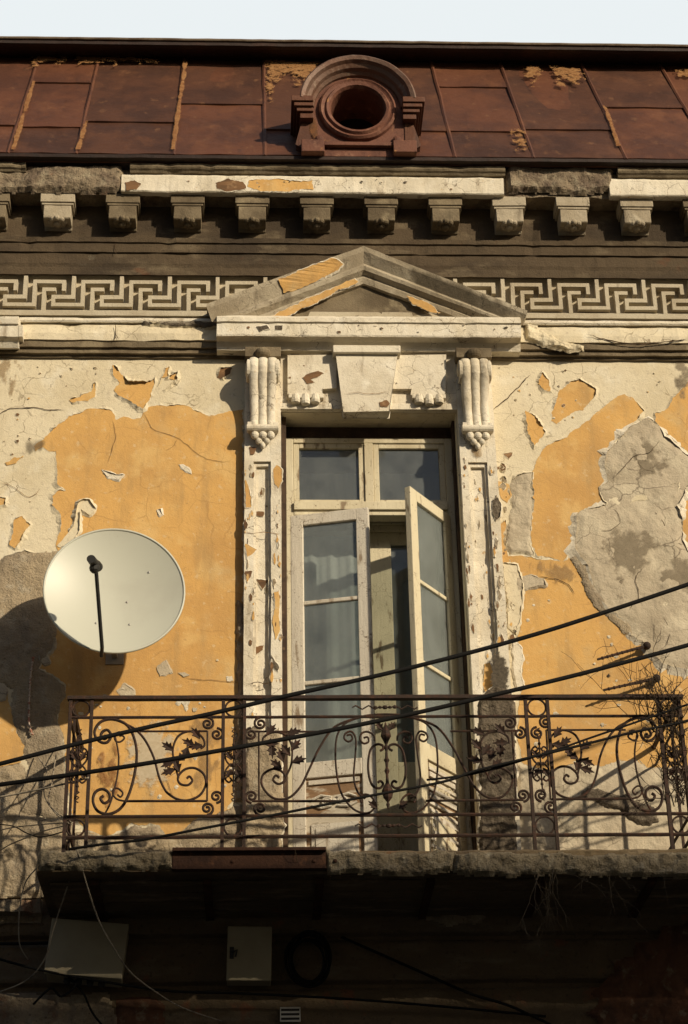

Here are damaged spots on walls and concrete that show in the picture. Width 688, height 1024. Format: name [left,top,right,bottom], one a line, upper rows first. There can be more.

corrosion [11,81,35,149]
corrosion [171,61,187,149]
corrosion [265,59,320,102]
corrosion [524,65,586,87]
corrosion [603,105,621,146]
peeling [125,180,142,190]
peeling [216,178,314,193]
peeling [247,257,358,333]
peeling [0,364,287,898]
flaking render [326,369,688,879]